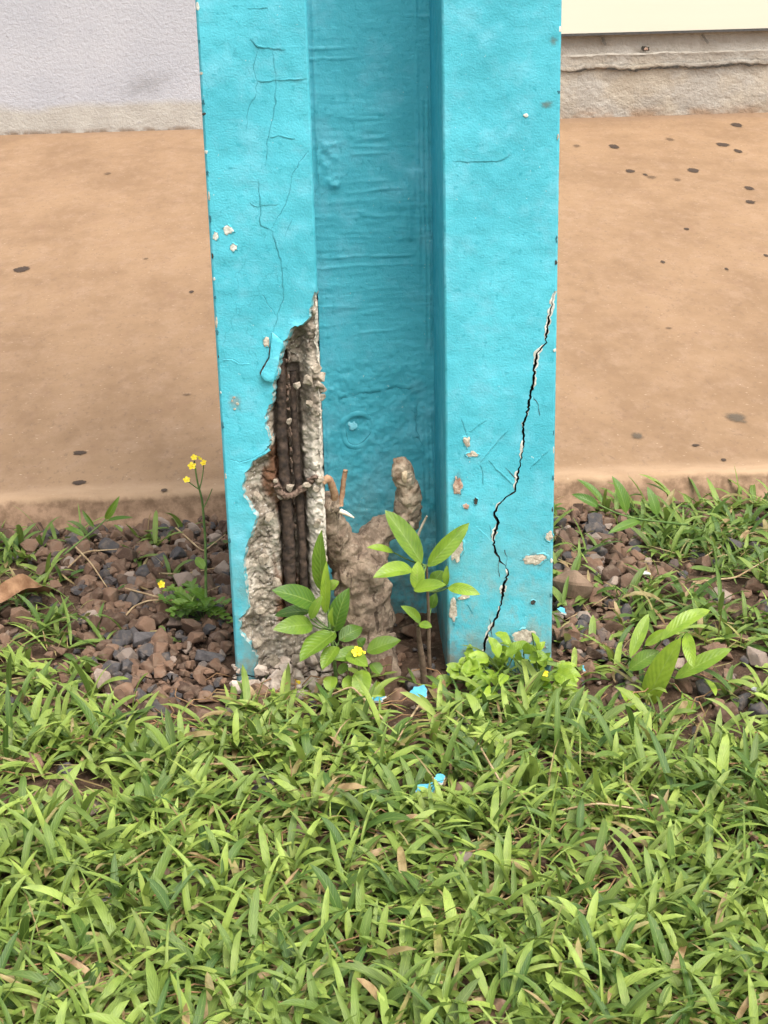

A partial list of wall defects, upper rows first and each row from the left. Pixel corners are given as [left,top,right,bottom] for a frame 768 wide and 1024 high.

crack [245,39,311,332]
peeling [462,435,480,458]
rust [262,442,296,512]
spalling [238,290,414,681]
peeling [453,475,478,509]
crack [461,291,557,652]
peeling [451,539,465,563]
peeling [520,531,554,565]
rust [277,598,296,635]
peeling [449,595,470,625]